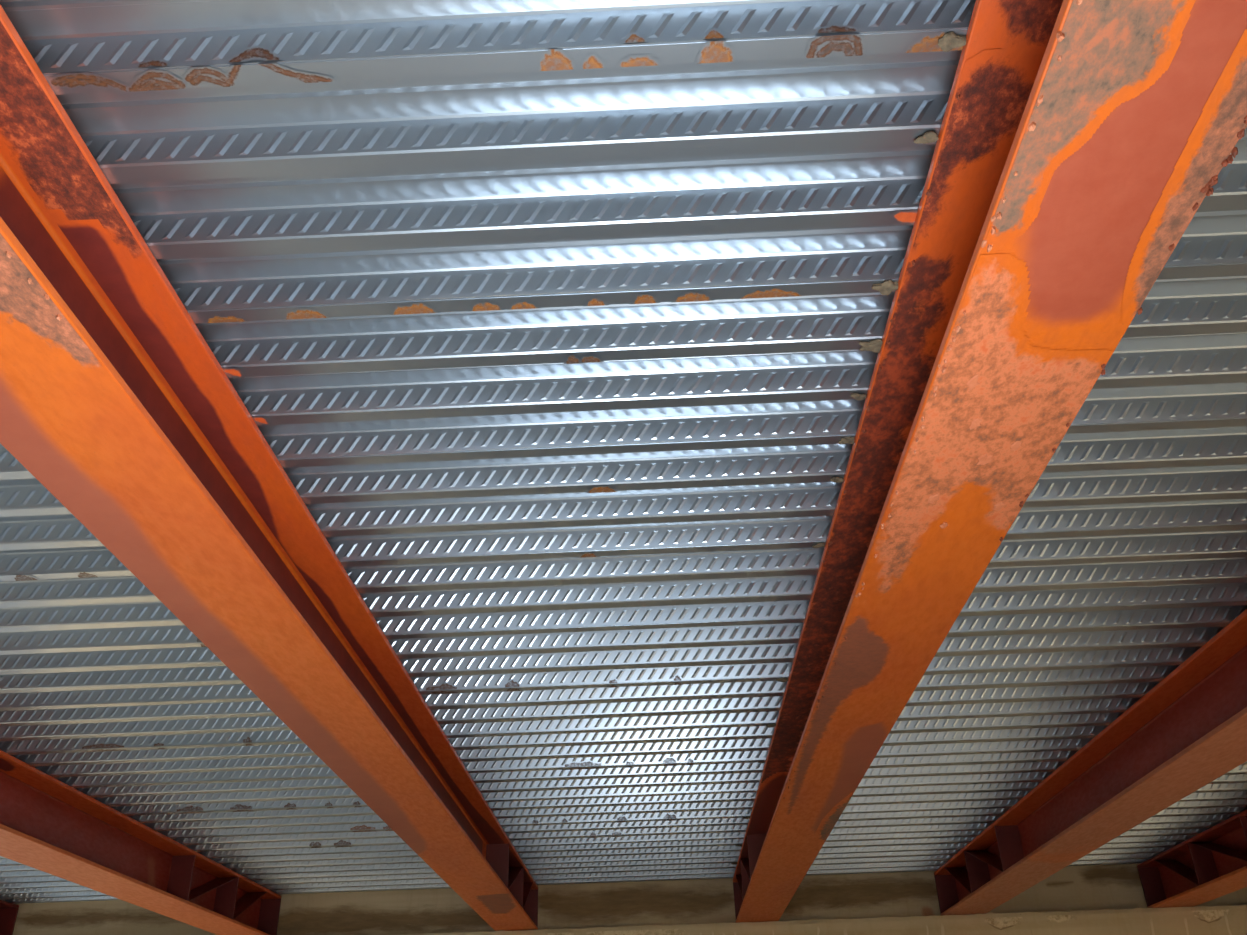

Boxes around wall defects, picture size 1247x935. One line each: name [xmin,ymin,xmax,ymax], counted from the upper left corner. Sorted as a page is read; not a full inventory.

rust [535,32,663,71]
rust [693,28,738,64]
rust [0,21,335,263]
rust [1121,29,1247,324]
rust [389,302,440,315]
rust [469,301,540,311]
rust [585,297,608,306]
rust [630,291,714,304]
rust [737,287,804,299]
rust [761,0,1063,783]
rust [815,791,855,843]
damp [14,902,191,935]